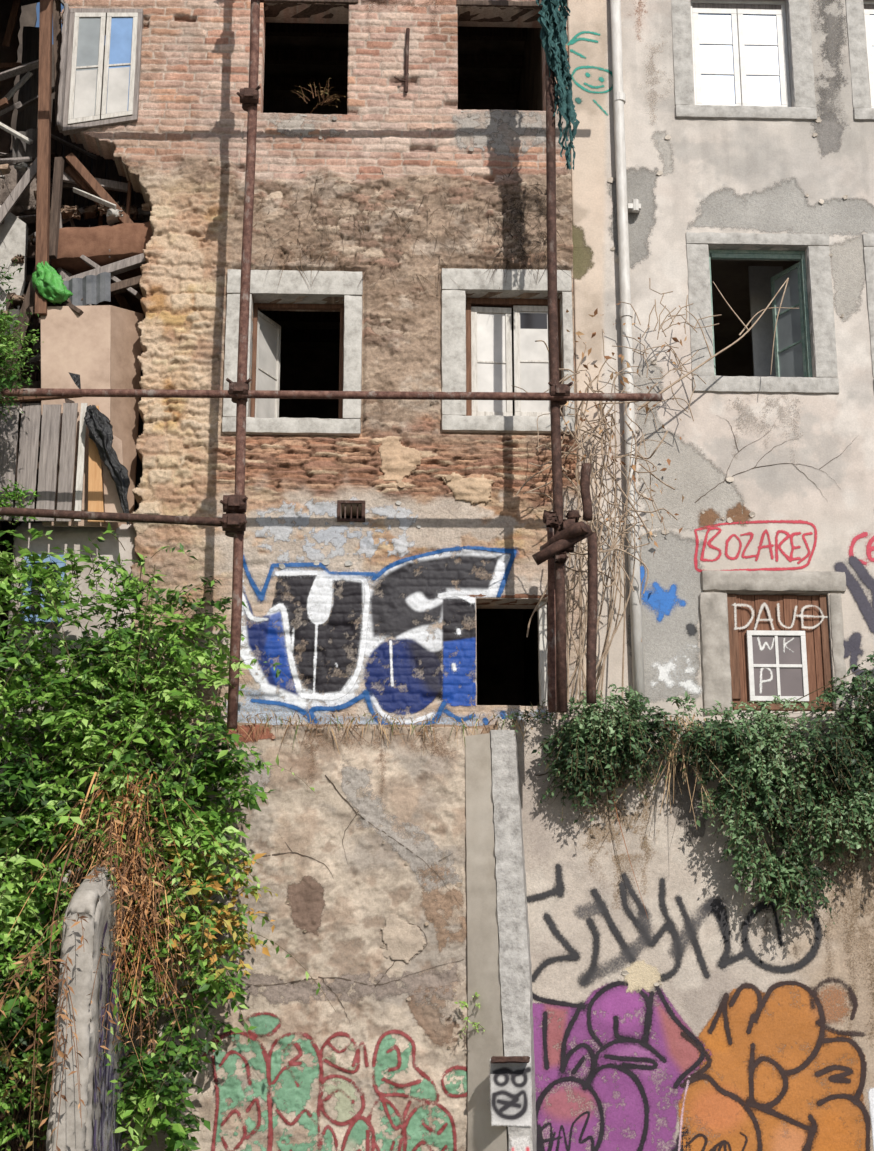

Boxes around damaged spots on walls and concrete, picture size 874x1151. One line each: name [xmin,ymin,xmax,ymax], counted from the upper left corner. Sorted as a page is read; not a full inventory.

spalling [812,112,844,157]
peeling [608,131,674,269]
spalling [572,223,593,279]
peeling [687,178,874,321]
crack [695,415,854,503]
peeling [255,497,421,576]
peeling [627,359,756,703]
crack [262,775,462,906]
peeling [341,765,467,952]
spalling [285,876,325,936]
peeling [231,961,465,1049]